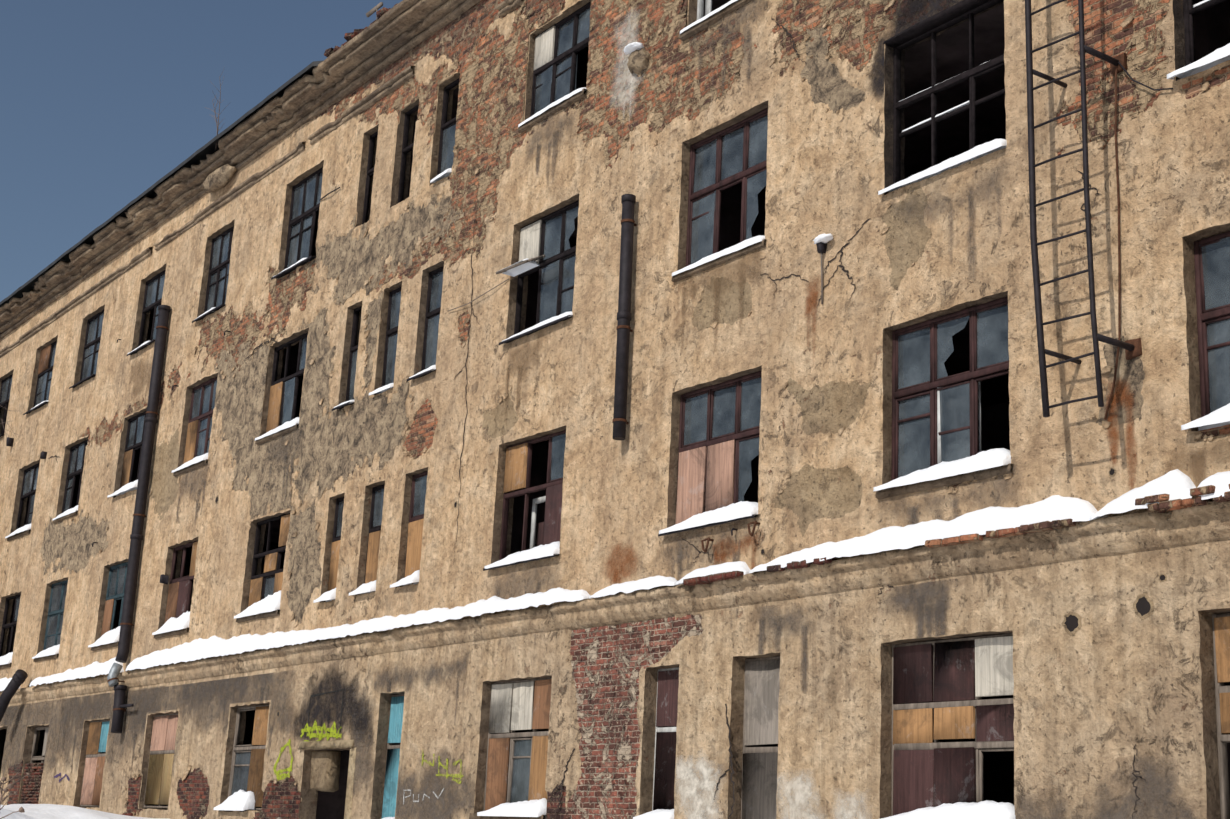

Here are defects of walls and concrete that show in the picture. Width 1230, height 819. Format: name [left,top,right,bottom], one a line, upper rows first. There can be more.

flaking render [565,0,757,170]
flaking render [768,0,928,114]
flaking render [1055,0,1171,150]
crack [761,219,869,306]
flaking render [79,0,566,627]
flaking render [781,378,872,437]
rust [1108,382,1135,462]
flaking render [772,464,862,537]
flaking render [683,571,744,586]
flaking render [760,548,839,572]
flaking render [543,614,703,819]
flaking render [176,764,210,819]